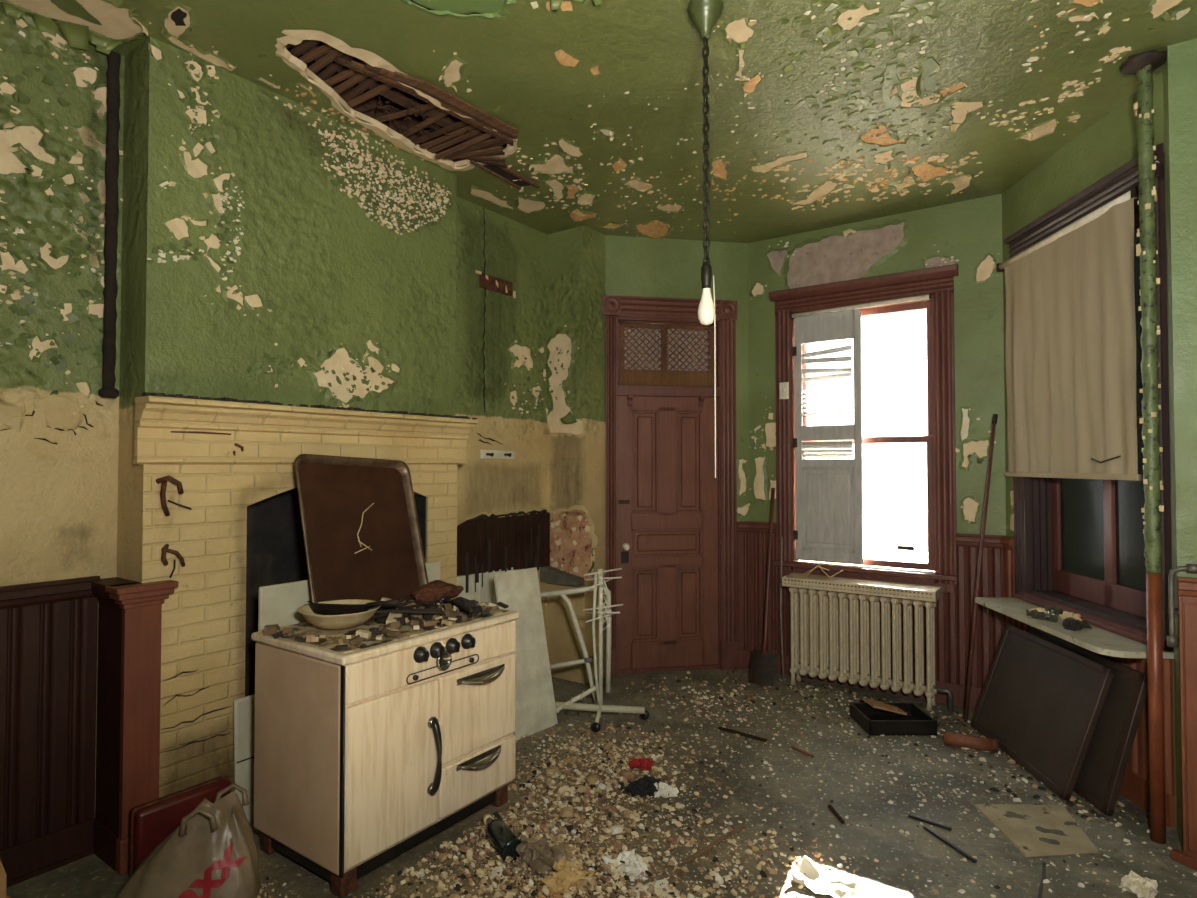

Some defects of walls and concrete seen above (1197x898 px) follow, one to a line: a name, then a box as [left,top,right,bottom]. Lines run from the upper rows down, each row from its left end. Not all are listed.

peeling [1057,0,1195,53]
peeling [438,52,472,92]
spalling [253,74,452,235]
peeling [468,0,1131,239]
peeling [0,0,272,400]
spalling [749,219,910,299]
crack [0,399,104,445]
peeling [244,338,401,408]
peeling [505,325,587,438]
peeling [736,397,776,518]
peeling [1139,405,1163,490]